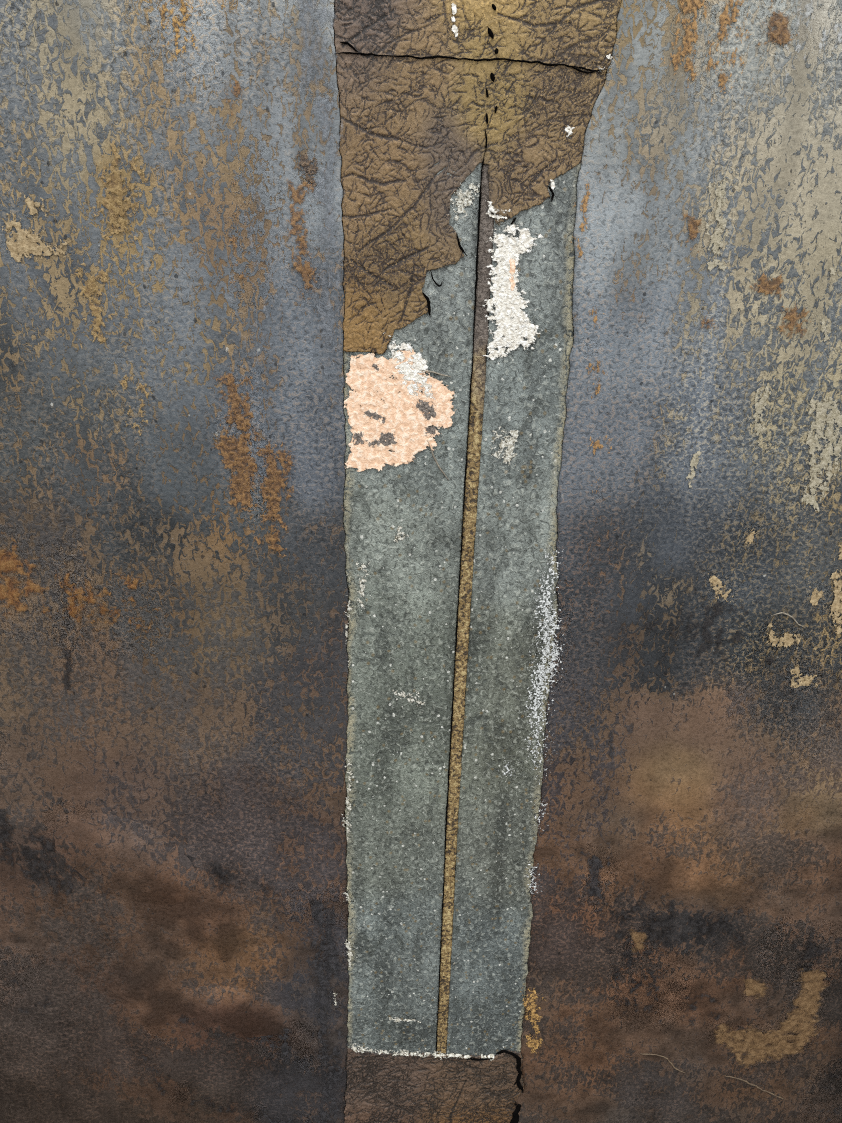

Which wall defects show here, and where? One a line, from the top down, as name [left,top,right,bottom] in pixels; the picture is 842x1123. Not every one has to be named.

rust [160,0,207,59]
rust [661,0,797,102]
rust [286,180,317,297]
peeling [449,183,544,360]
rust [750,273,810,344]
rust [215,373,294,557]
peeling [344,332,456,472]
peeling [488,426,519,466]
crack [334,4,607,1053]
peeling [809,544,842,634]
peeling [790,665,819,688]
crack [467,1050,523,1123]